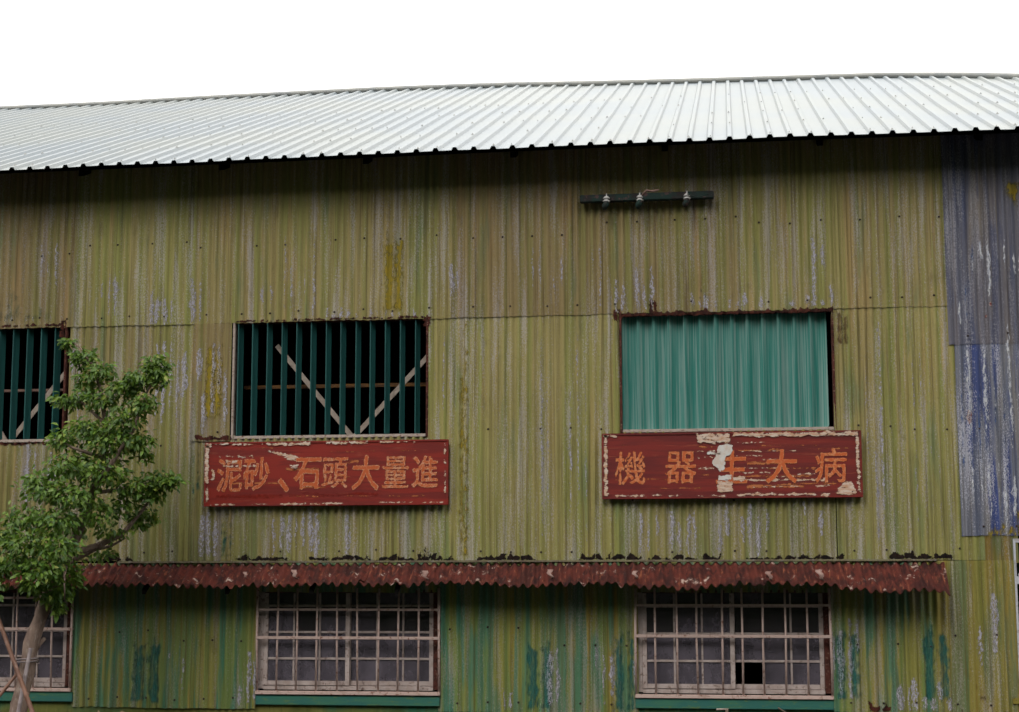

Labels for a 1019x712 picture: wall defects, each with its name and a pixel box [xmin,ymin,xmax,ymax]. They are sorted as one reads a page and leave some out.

rust [58,547,953,596]